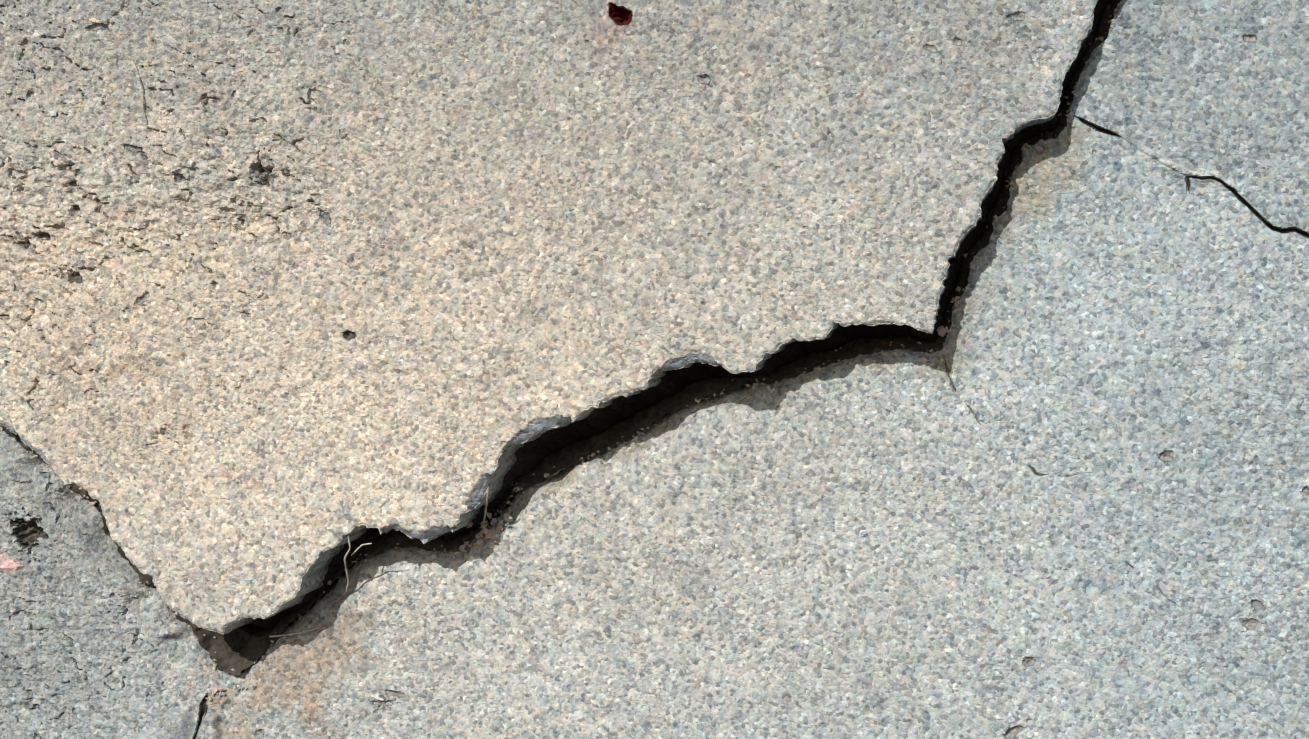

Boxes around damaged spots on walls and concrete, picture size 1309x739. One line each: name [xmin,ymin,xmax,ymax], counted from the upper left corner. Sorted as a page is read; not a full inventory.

crack [135,65,148,125]
crack [1186,176,1309,237]
crack [170,0,1126,739]
crack [0,426,157,589]